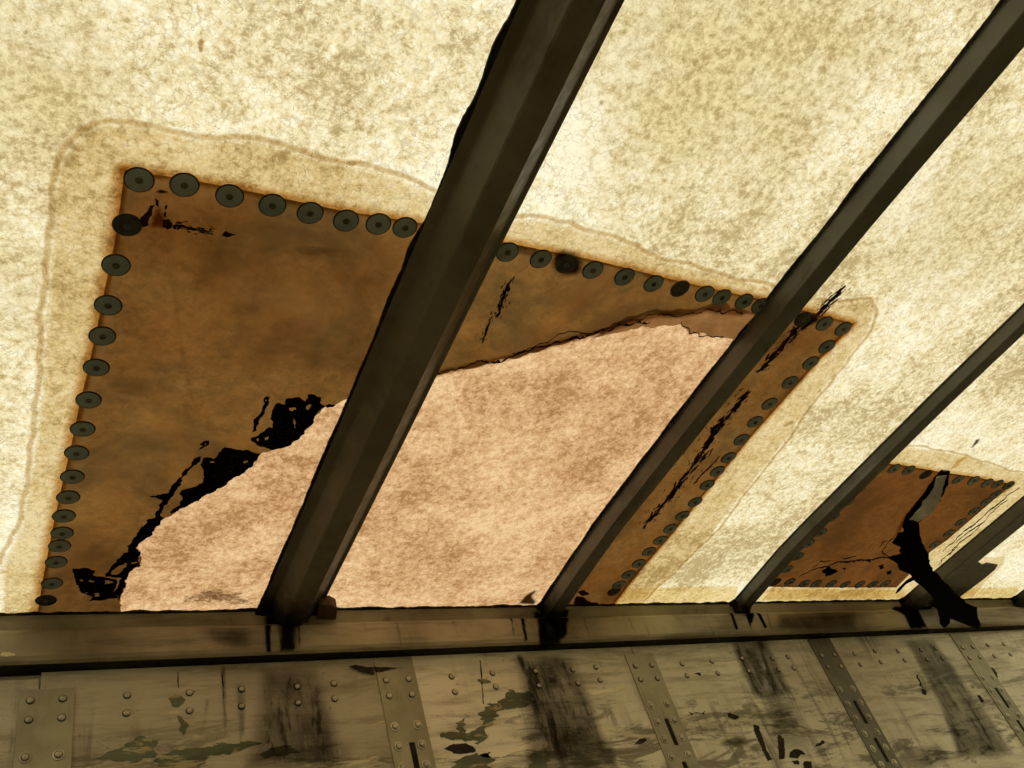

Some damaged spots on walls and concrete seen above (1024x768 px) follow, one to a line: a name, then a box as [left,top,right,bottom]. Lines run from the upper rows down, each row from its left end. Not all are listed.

crack [171,221,215,235]
crack [437,275,743,376]
crack [639,285,850,529]
peeling [72,394,335,601]
crack [939,487,1020,565]
water stain [509,609,570,648]
peeling [574,590,598,605]
peeling [168,694,189,735]
peeling [95,736,300,768]
peeling [440,689,551,768]
water stain [519,656,613,768]